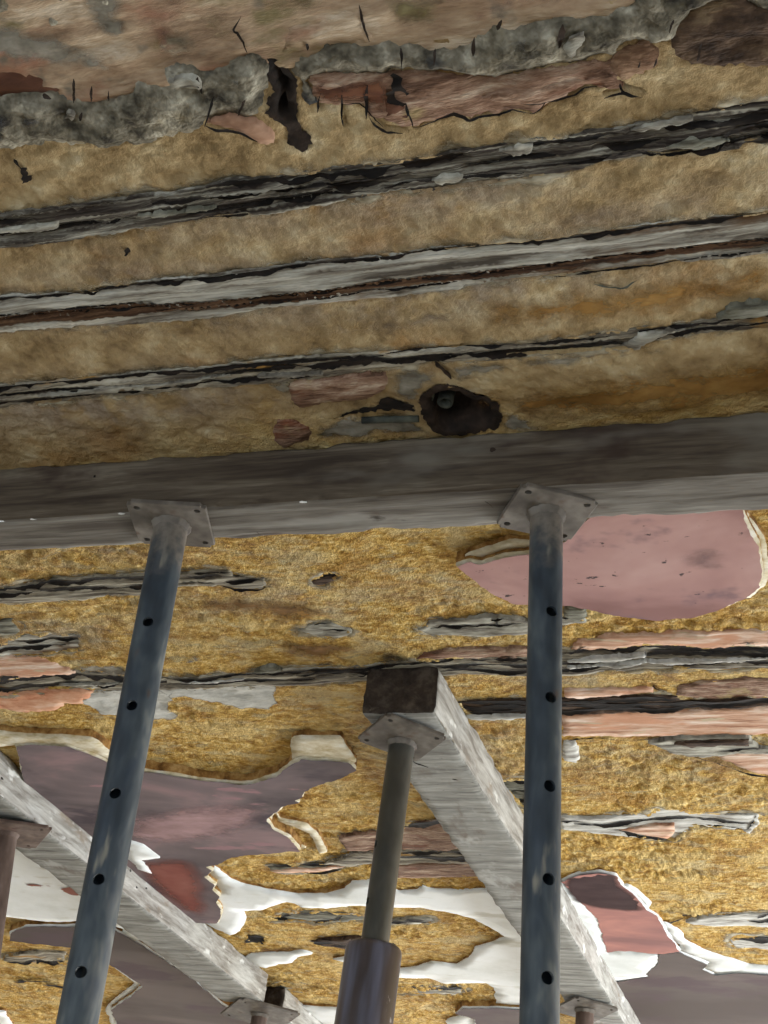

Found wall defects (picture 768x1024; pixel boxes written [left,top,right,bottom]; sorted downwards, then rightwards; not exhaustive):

flaking render [0,0,768,150]
crack [317,84,642,134]
peeling [456,534,530,605]
peeling [563,510,768,669]
peeling [0,724,111,837]
flaking render [0,654,123,713]
peeling [127,729,370,935]
flaking render [562,676,768,775]
peeling [6,849,81,948]
peeling [246,949,313,968]
peeling [394,884,521,1024]
peeling [561,867,768,1024]